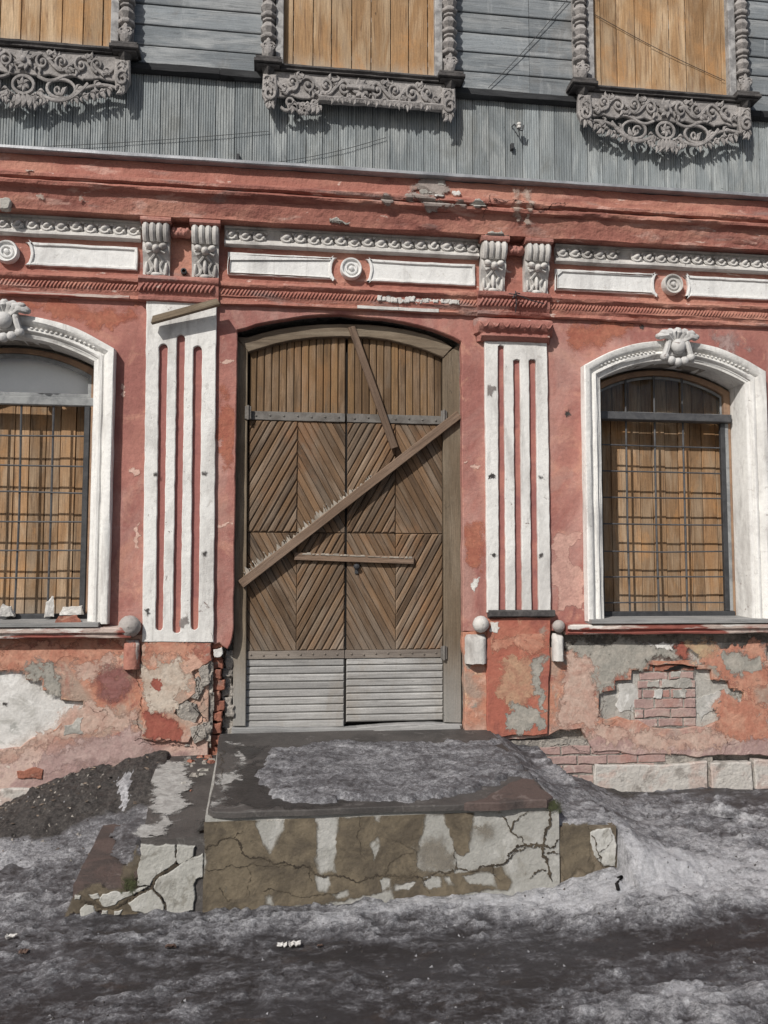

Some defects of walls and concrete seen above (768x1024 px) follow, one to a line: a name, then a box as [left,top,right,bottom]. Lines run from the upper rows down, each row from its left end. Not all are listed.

peeling [381,178,466,213]
peeling [357,295,460,313]
peeling [0,638,214,765]
flaking render [489,622,768,755]
crack [79,810,559,910]